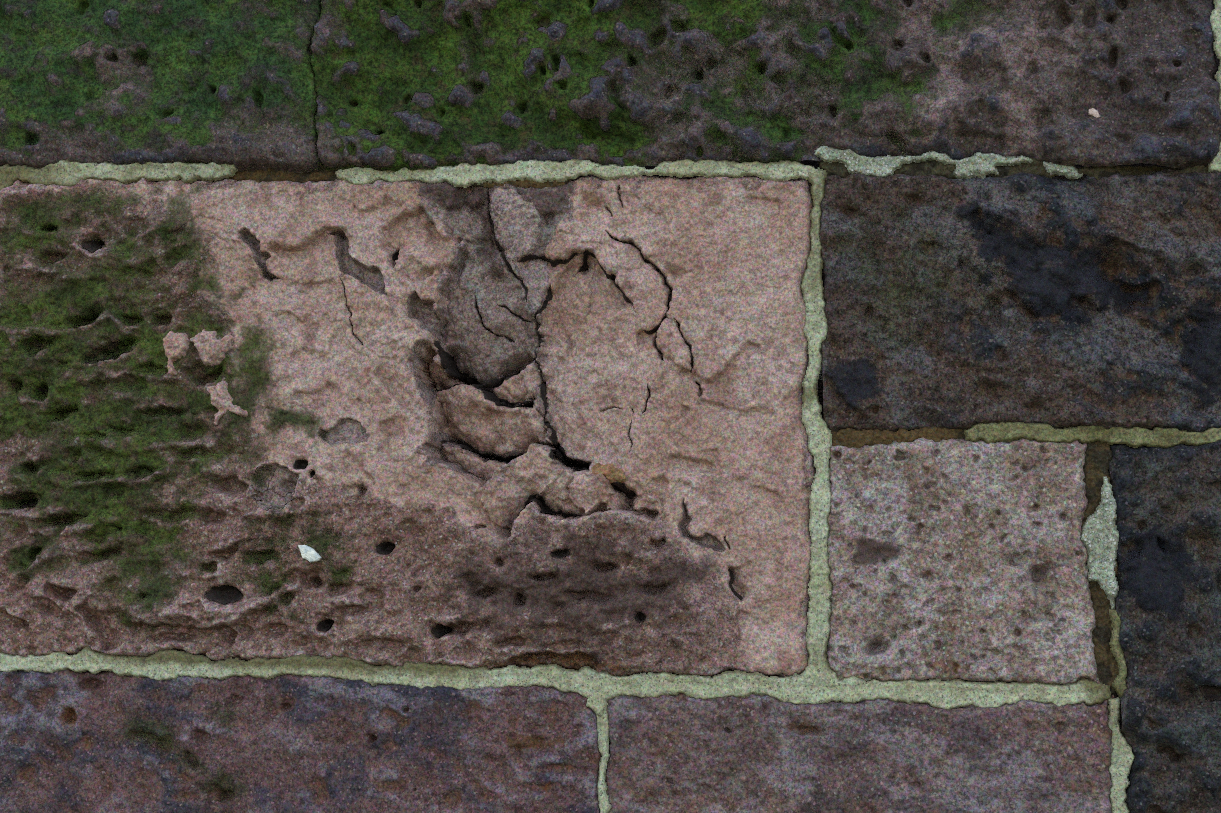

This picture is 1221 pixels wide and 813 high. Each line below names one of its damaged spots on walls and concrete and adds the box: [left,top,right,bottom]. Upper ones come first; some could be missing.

spalling [87,168,813,678]
crack [475,185,701,465]